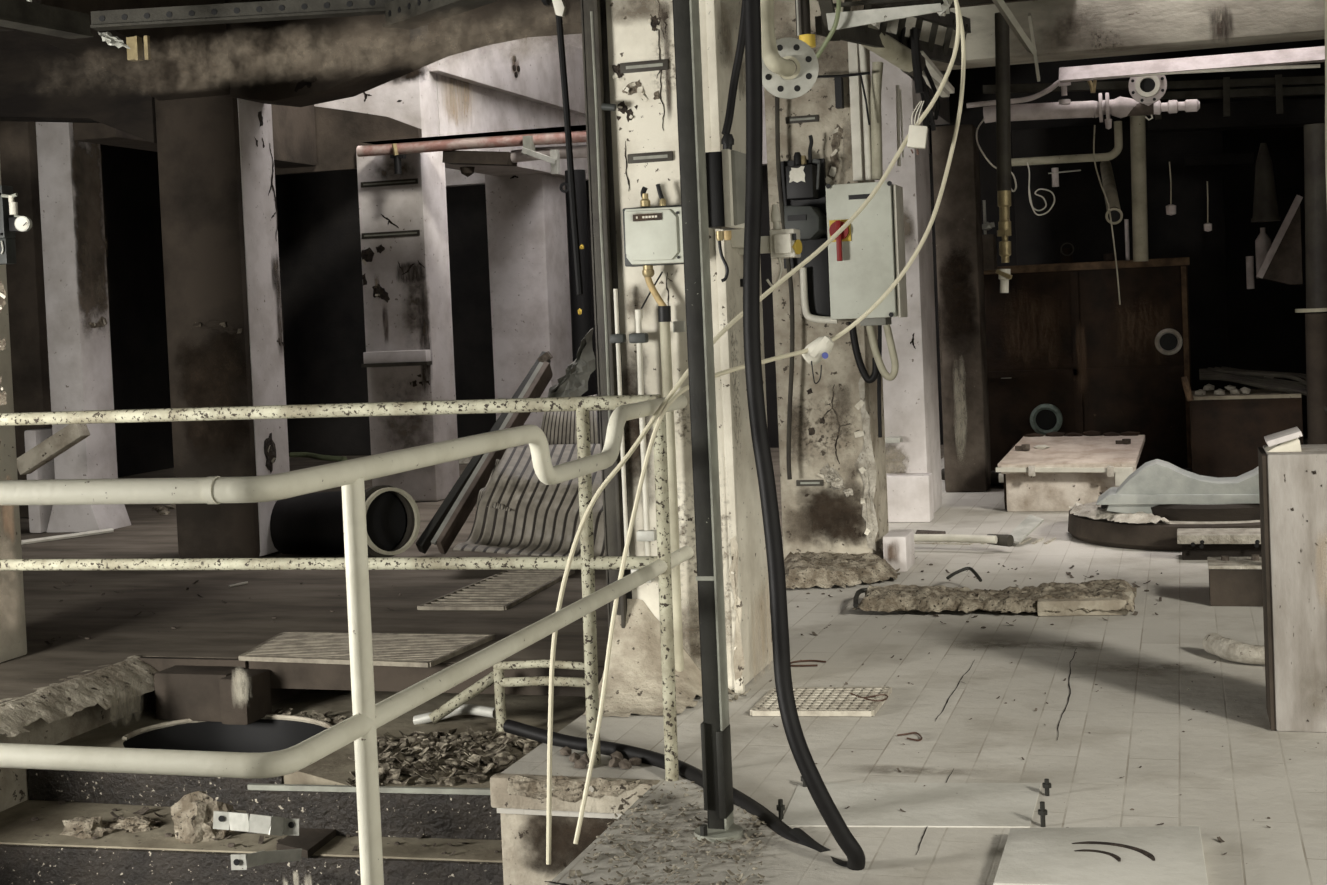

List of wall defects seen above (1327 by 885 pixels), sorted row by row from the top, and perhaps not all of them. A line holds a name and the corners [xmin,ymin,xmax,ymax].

spalling [361,244,390,303]
peeling [817,376,878,551]
leakage [787,469,865,545]
crack [935,660,975,721]
crack [1057,649,1076,740]